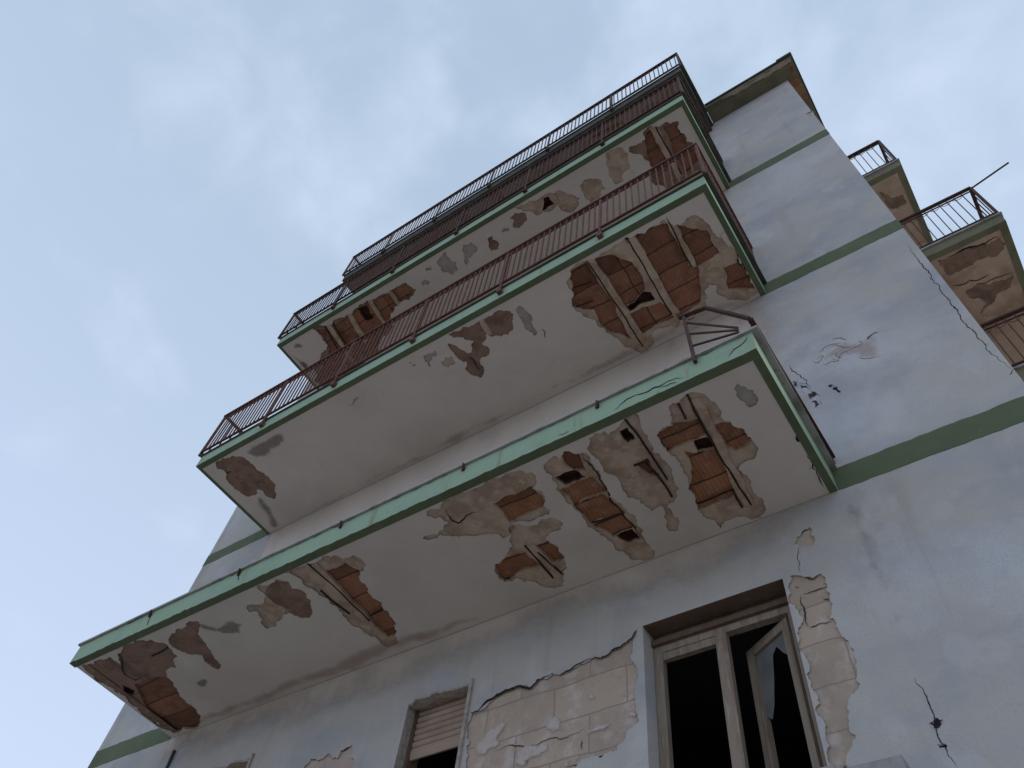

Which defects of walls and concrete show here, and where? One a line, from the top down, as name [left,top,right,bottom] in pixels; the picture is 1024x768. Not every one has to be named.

spalling [313,121,701,386]
spalling [567,215,757,352]
crack [910,248,1017,373]
spalling [938,238,1005,276]
spalling [966,275,1013,313]
spalling [216,456,276,499]
spalling [424,392,766,587]
spalling [247,555,398,646]
spalling [83,621,221,732]
spalling [467,633,639,768]
spalling [789,575,860,768]
crack [915,681,958,768]